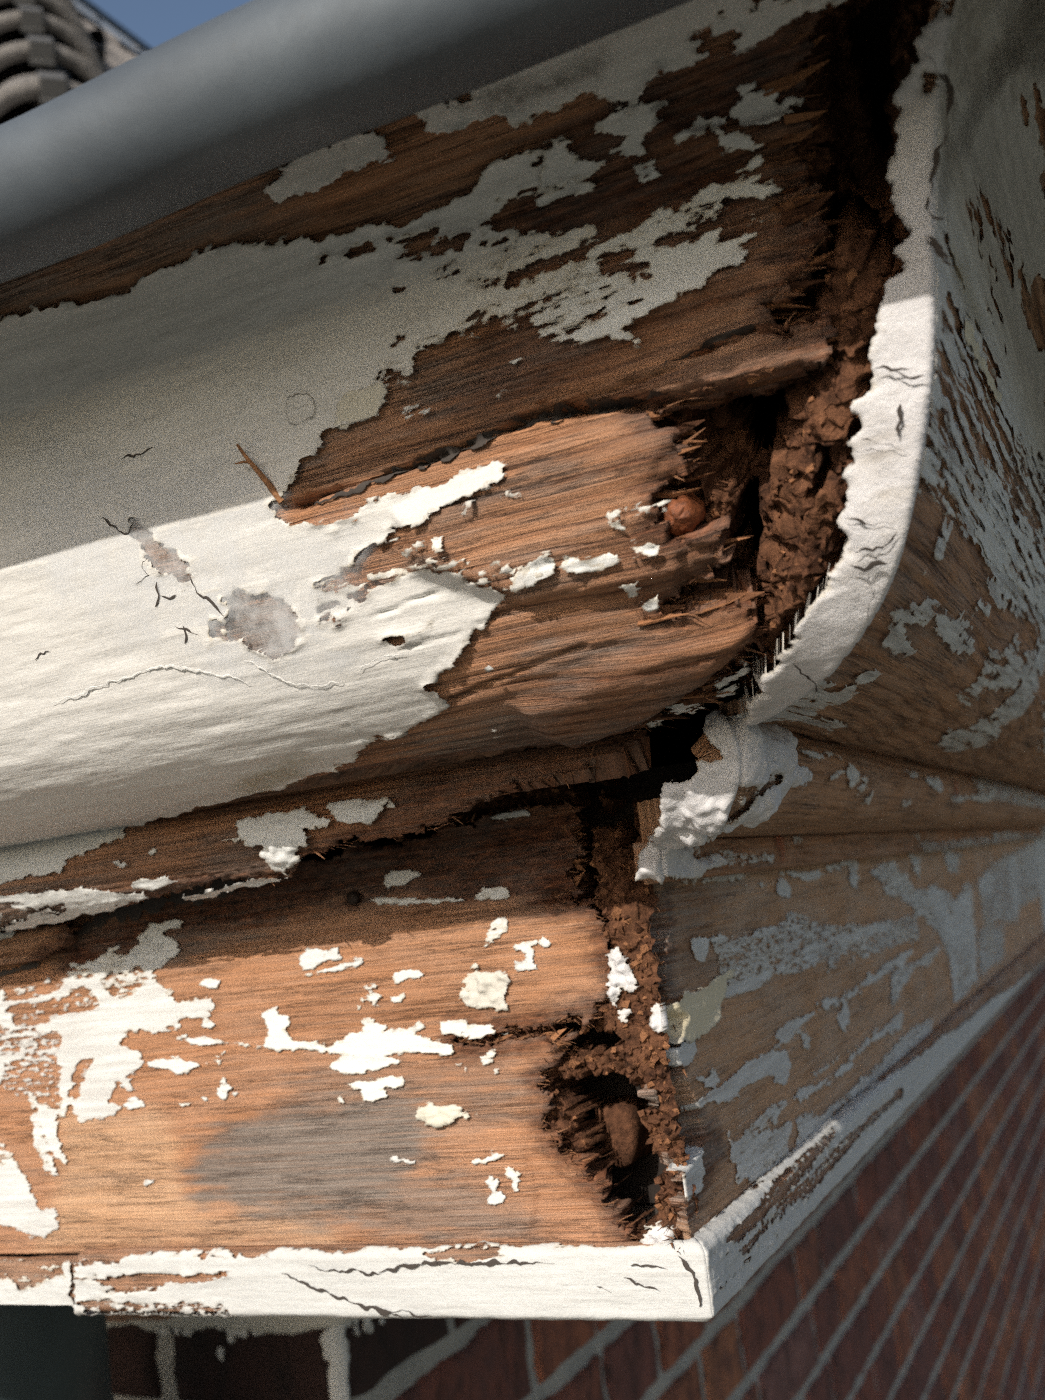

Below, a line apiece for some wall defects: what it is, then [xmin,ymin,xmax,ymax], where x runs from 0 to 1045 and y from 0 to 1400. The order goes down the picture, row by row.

crack [925,54,954,266]
peeling [0,0,847,940]
crack [861,365,924,451]
peeling [882,0,1045,752]
crack [843,516,898,620]
peeling [726,669,882,805]
crack [793,663,818,693]
peeling [0,755,1045,1322]
crack [281,1258,542,1319]
crack [597,1256,702,1307]